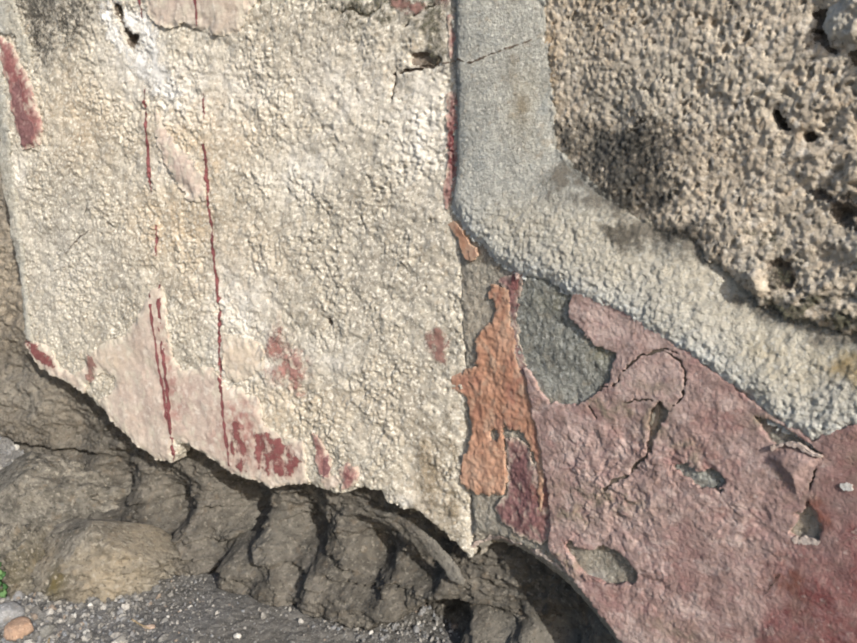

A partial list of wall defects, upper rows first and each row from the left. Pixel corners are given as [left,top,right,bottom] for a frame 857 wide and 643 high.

crack [391,39,532,99]
peeling [425,328,449,363]
peeling [24,286,359,491]
peeling [450,269,617,578]
crack [589,348,687,491]
flaking render [759,417,822,454]
flaking render [675,462,726,491]
peeling [373,510,466,585]
flaking render [566,540,638,584]